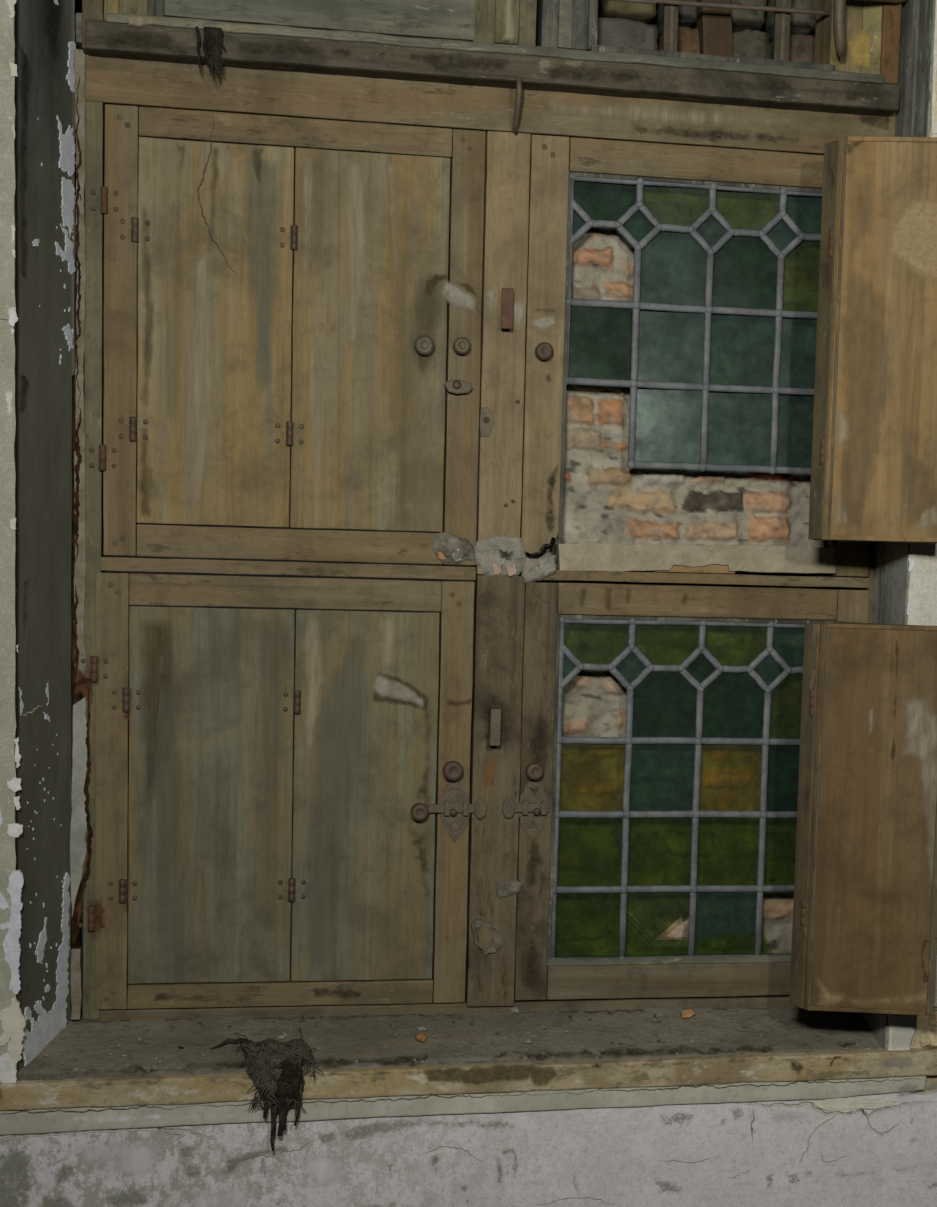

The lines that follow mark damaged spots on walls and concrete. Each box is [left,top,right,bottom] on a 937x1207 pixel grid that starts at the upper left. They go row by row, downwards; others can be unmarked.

peeling [66,41,76,93]
peeling [55,115,76,289]
peeling [59,307,74,364]
flaking render [0,870,71,1083]
flaking render [884,1006,937,1067]
flaking render [908,1075,937,1093]
crack [303,1078,935,1164]
crack [538,1197,614,1205]